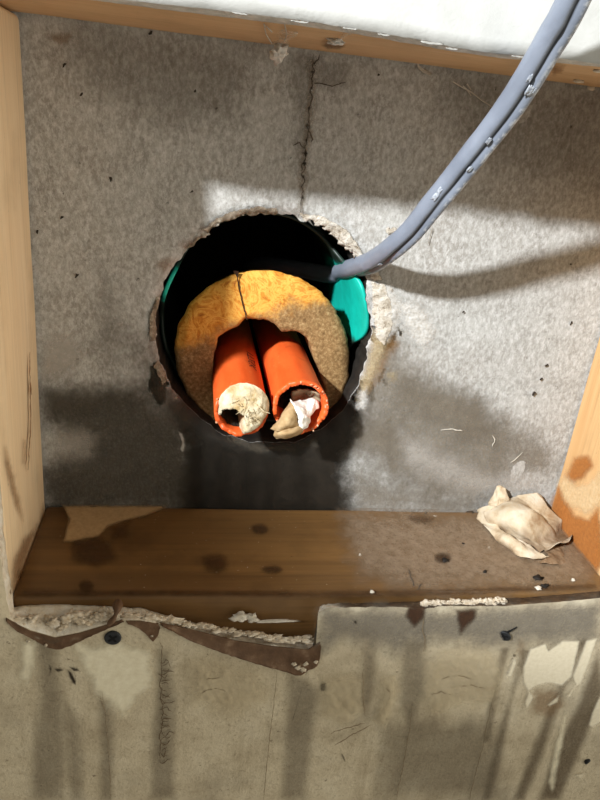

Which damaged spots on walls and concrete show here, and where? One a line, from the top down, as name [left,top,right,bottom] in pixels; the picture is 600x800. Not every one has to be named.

crack [293,54,345,216]
peeling [20,641,35,681]
flaking render [228,611,299,623]
water stain [323,605,599,647]
water stain [520,714,552,797]
water stain [545,663,600,798]